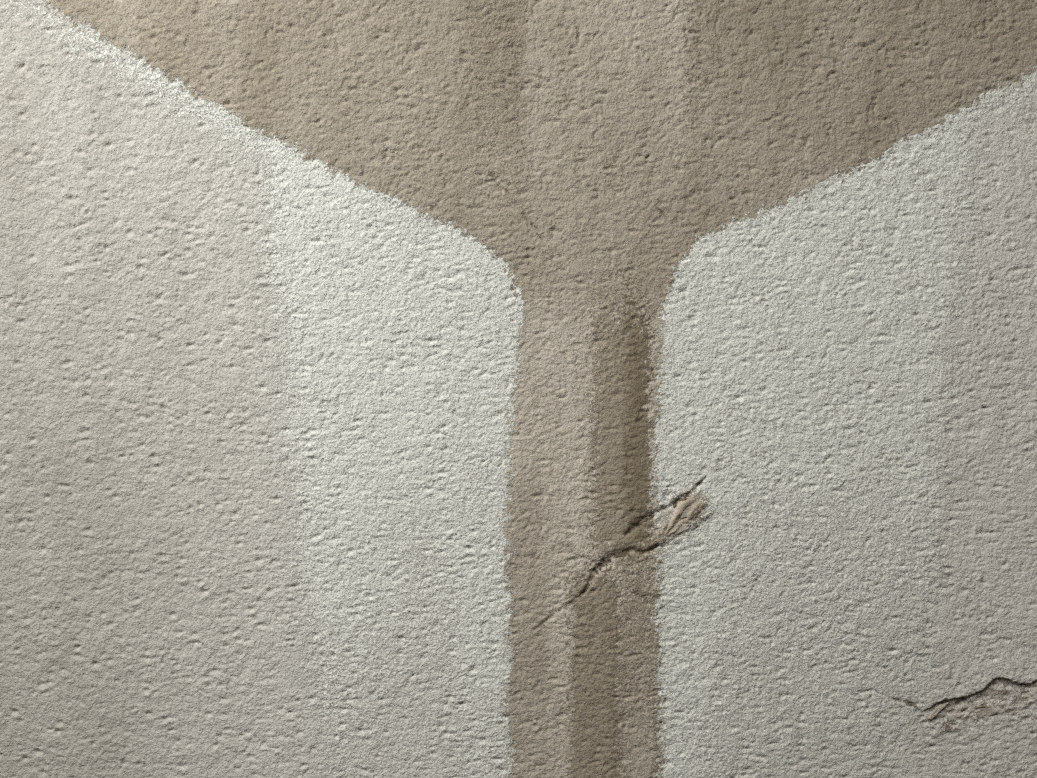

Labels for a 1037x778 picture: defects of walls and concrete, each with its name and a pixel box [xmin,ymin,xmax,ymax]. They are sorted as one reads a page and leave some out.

crack [538,480,703,627]
crack [892,678,1037,735]